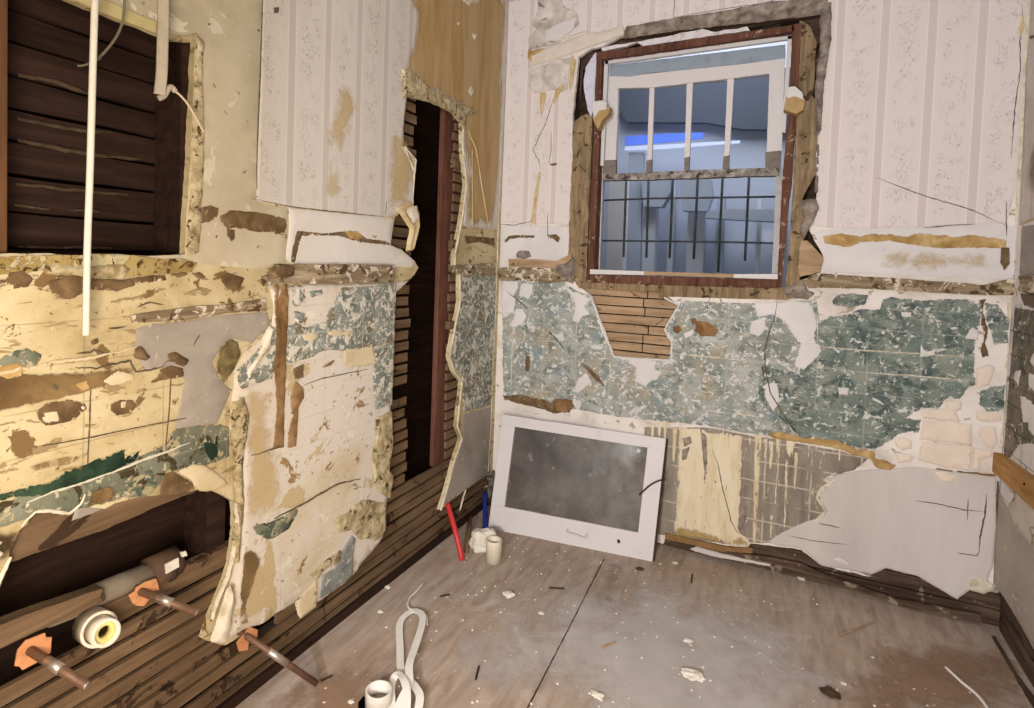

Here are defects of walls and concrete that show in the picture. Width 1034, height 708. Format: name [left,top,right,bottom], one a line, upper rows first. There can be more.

peeling [0,270,33,289]
flaking render [528,0,579,50]
peeling [253,69,1034,662]
crack [881,179,1034,235]
peeling [1013,0,1034,278]
spalling [0,312,285,708]